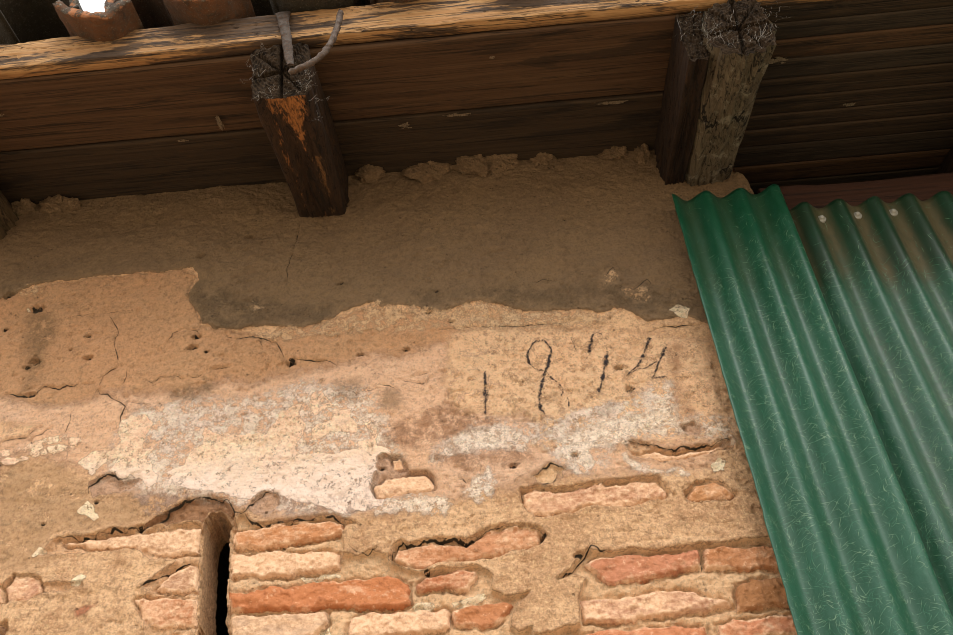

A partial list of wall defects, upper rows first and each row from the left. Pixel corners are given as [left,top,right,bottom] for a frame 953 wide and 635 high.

crack [4,310,133,421]
crack [228,336,337,366]
peeling [437,322,734,517]
peeling [0,421,81,465]
crack [628,438,728,452]
crack [57,492,351,543]
flaking render [44,381,797,635]
crack [355,526,503,560]
crack [559,545,605,579]
flaking render [0,576,83,605]